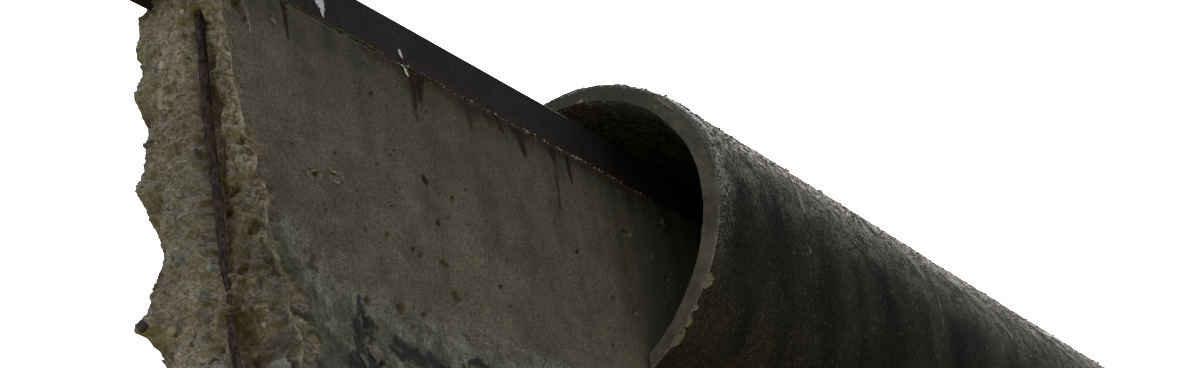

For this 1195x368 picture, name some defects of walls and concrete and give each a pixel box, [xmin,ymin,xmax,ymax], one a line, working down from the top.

spalling [134,0,315,368]